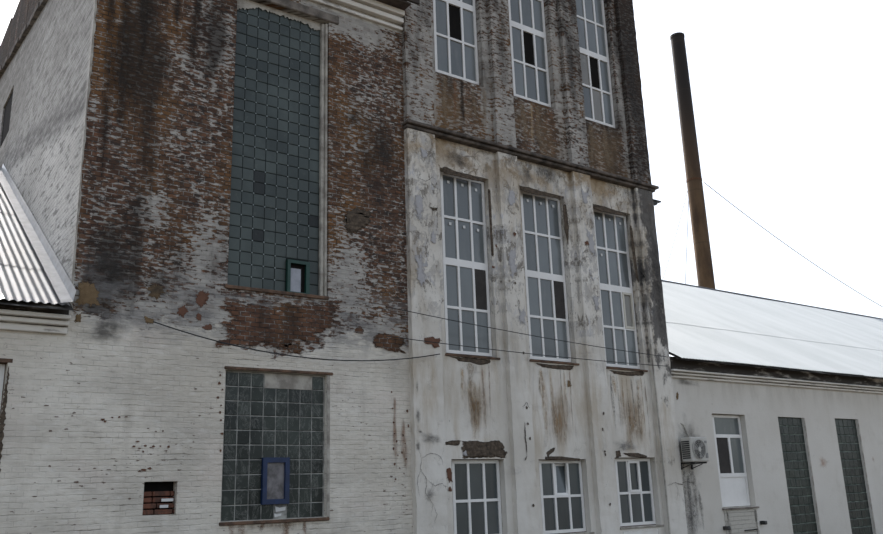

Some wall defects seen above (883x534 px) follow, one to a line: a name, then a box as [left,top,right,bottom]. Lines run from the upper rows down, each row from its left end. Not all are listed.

flaking render [177,291,345,354]
flaking render [373,333,406,353]
spalling [445,440,507,459]